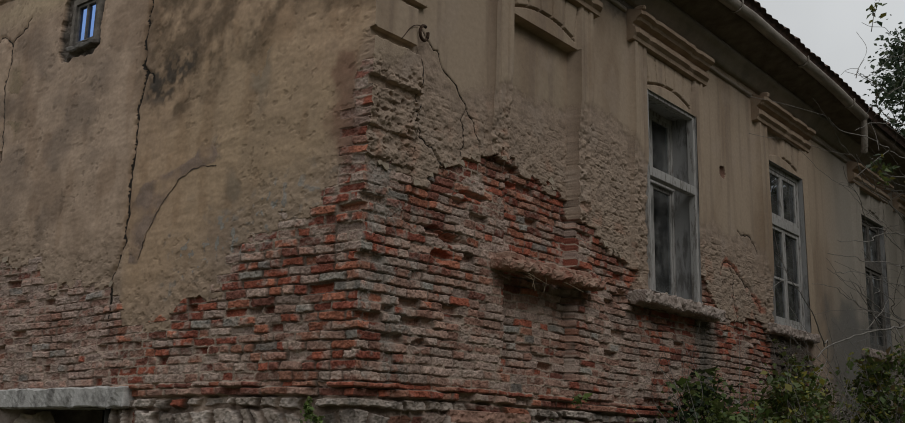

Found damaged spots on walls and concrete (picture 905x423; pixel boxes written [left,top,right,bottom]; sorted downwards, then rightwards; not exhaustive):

crack [1,18,32,149]
crack [107,0,155,324]
flaking render [0,32,702,419]
crack [415,31,479,166]
flaking render [701,218,863,423]